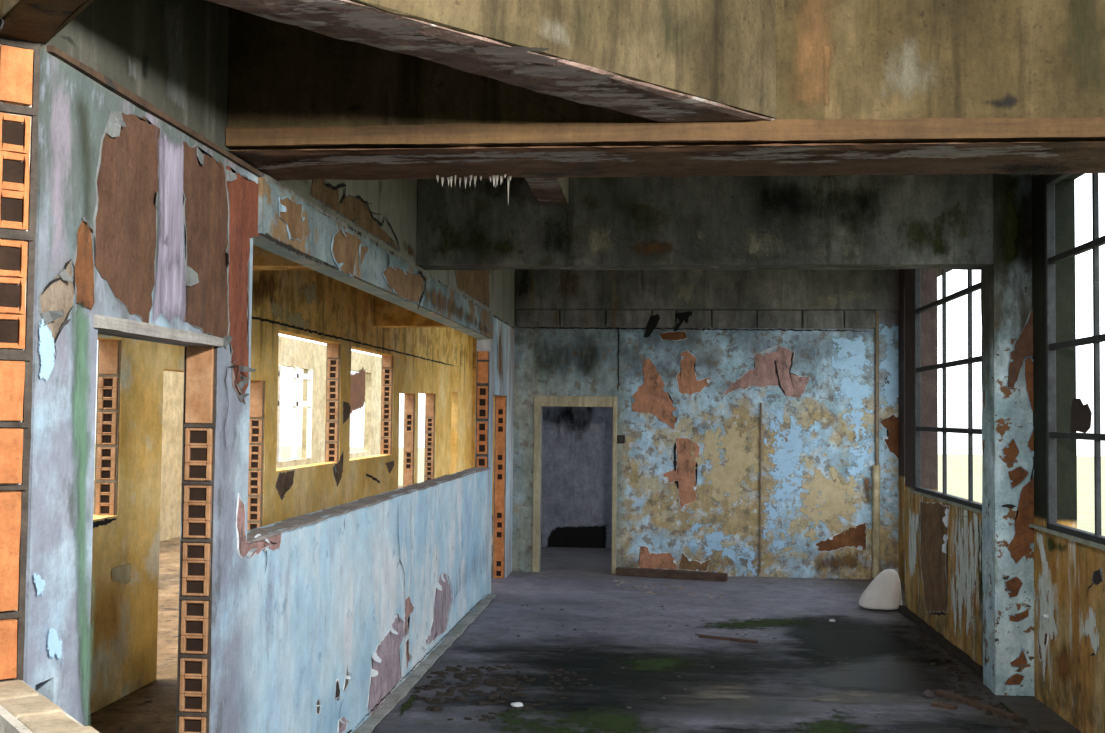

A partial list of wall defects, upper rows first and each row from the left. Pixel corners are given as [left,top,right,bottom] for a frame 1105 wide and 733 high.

flaking render [38,110,160,341]
spalling [93,379,117,528]
spalling [184,431,207,732]
spalling [236,421,282,559]
crack [252,316,458,367]
flaking render [181,142,636,404]
flaking render [367,573,452,716]
flaking render [631,331,711,508]
water stain [433,616,953,714]
flaking render [816,522,867,552]
flaking render [1002,427,1034,599]
flaking render [1006,309,1033,411]